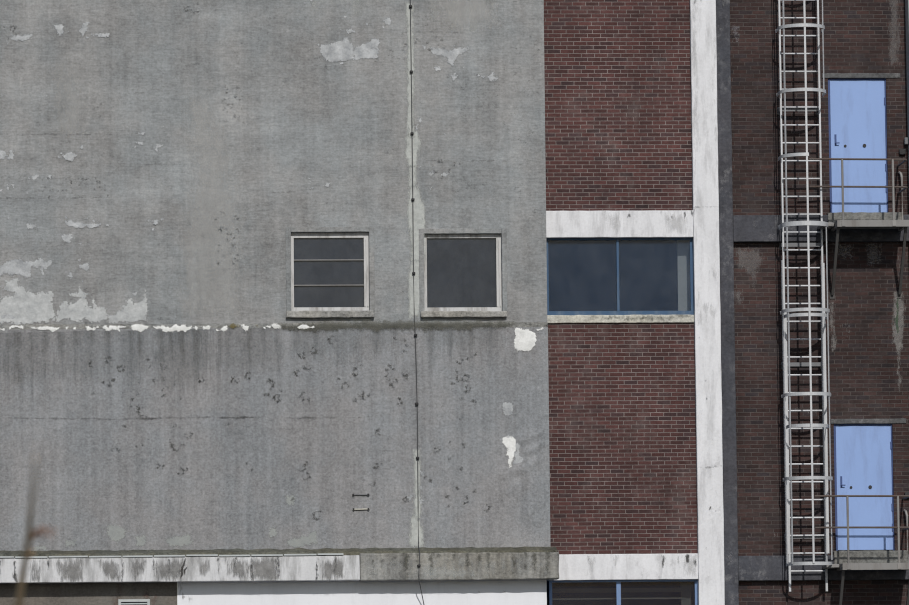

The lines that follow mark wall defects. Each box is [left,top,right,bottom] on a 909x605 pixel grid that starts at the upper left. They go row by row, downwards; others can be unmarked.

peeling [317,17,392,65]
peeling [422,45,469,81]
peeling [0,216,227,332]
spalling [514,327,544,351]
peeling [502,434,523,468]
water stain [32,560,82,583]
water stain [100,559,183,581]
water stain [229,557,280,580]
water stain [316,558,343,580]